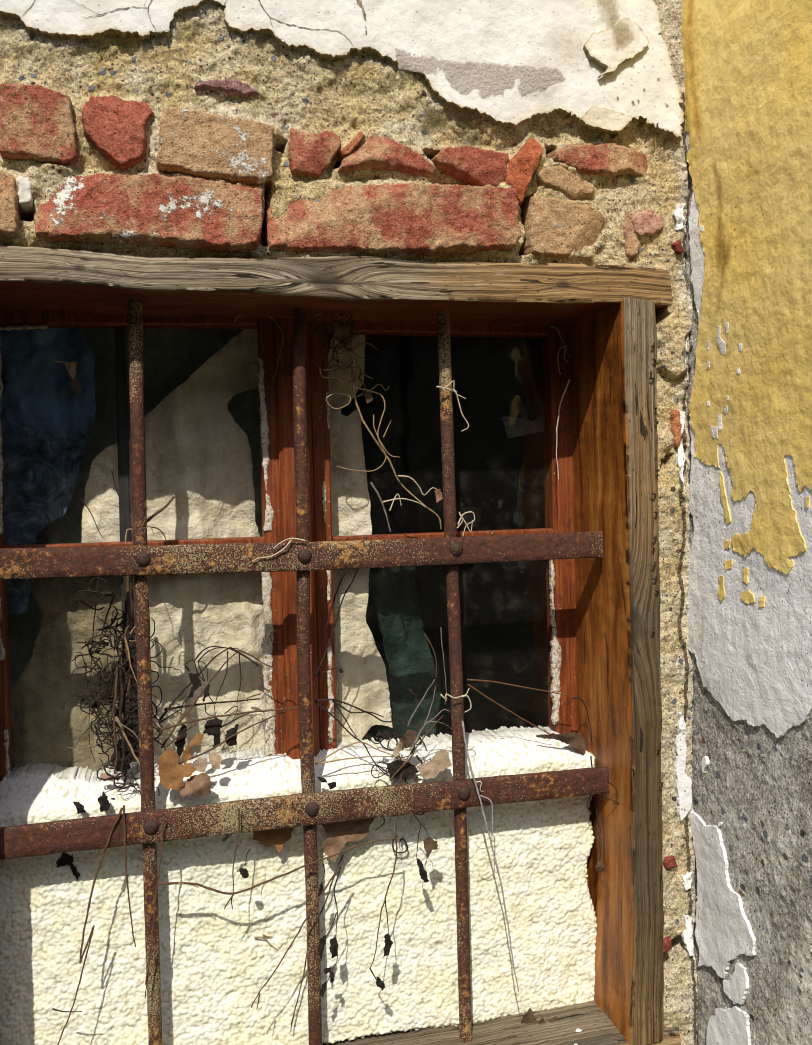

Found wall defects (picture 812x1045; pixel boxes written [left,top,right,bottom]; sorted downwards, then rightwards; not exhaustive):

crack [72,0,156,30]
crack [259,0,352,44]
flaking render [583,17,650,78]
peeling [396,49,564,97]
flaking render [579,106,632,133]
flaking render [672,203,686,231]
peeling [689,190,705,321]
flaking render [676,442,686,484]
peeling [687,417,812,709]
flaking render [674,712,692,821]
flaking render [688,653,812,1045]
flaking render [681,915,694,956]